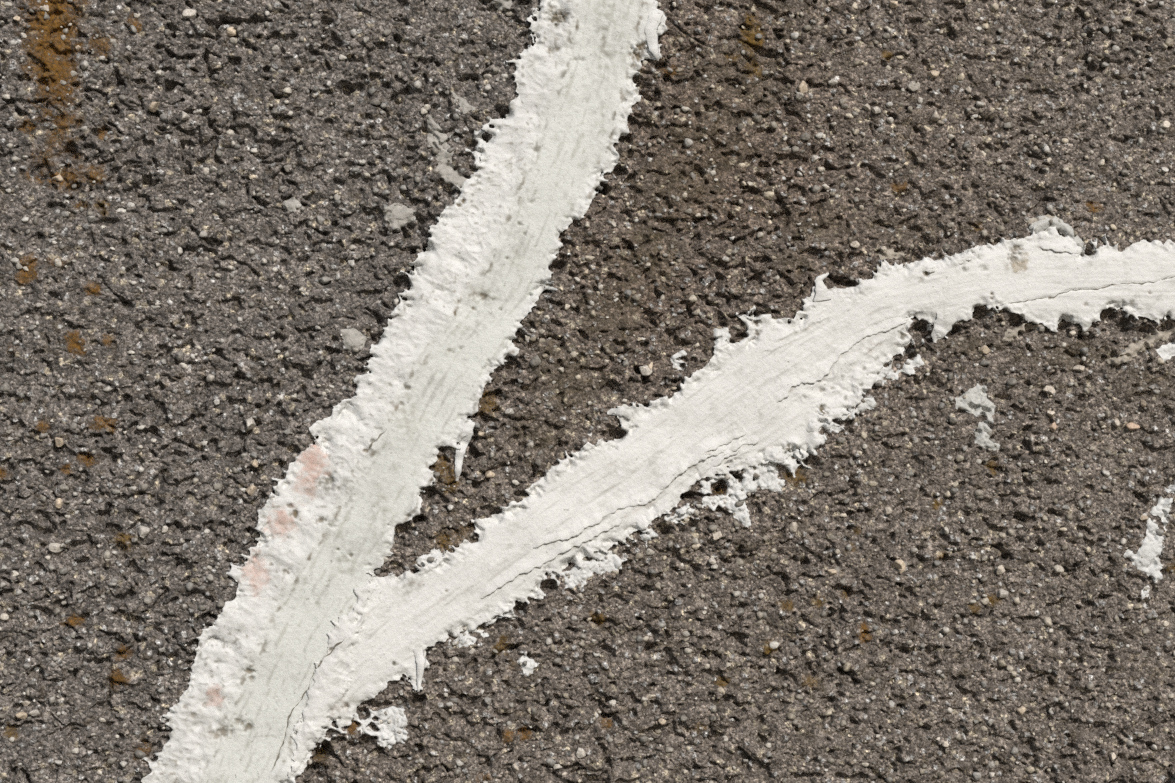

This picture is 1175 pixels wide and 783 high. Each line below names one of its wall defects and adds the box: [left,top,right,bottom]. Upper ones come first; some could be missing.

corrosion [23,0,77,132]
crack [141,0,668,783]
crack [288,215,1175,778]